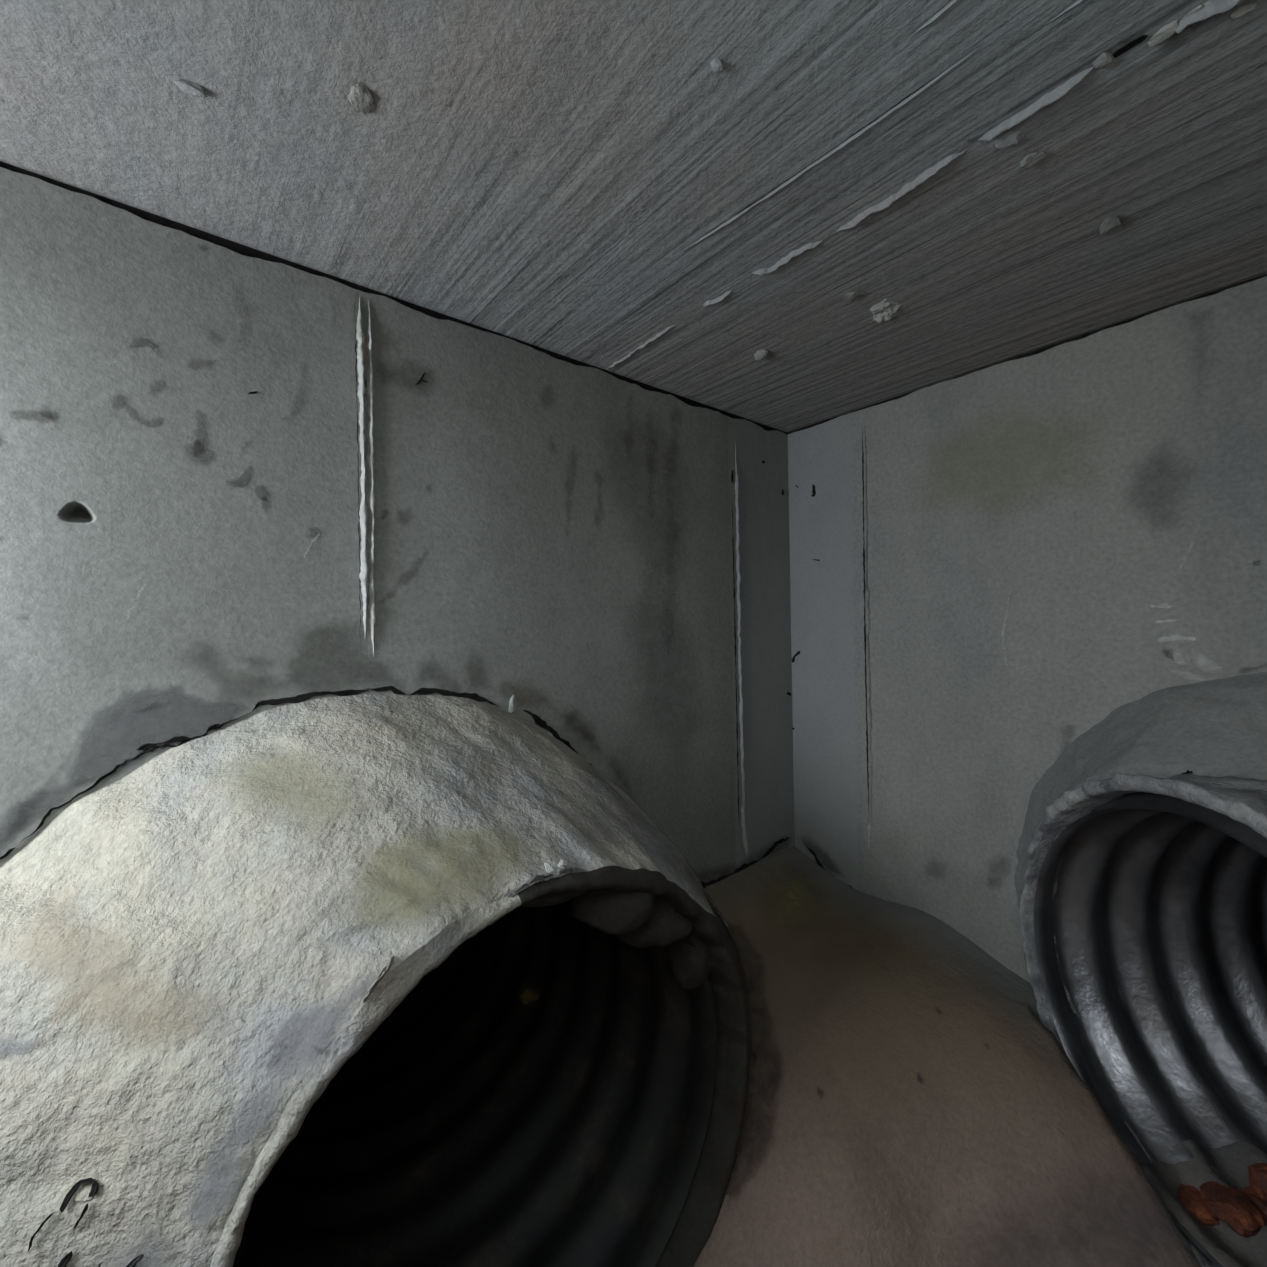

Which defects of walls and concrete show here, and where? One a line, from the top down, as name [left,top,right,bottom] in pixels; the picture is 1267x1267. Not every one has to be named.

peeling [1148,5,1204,47]
rust [1177,1163,1267,1237]